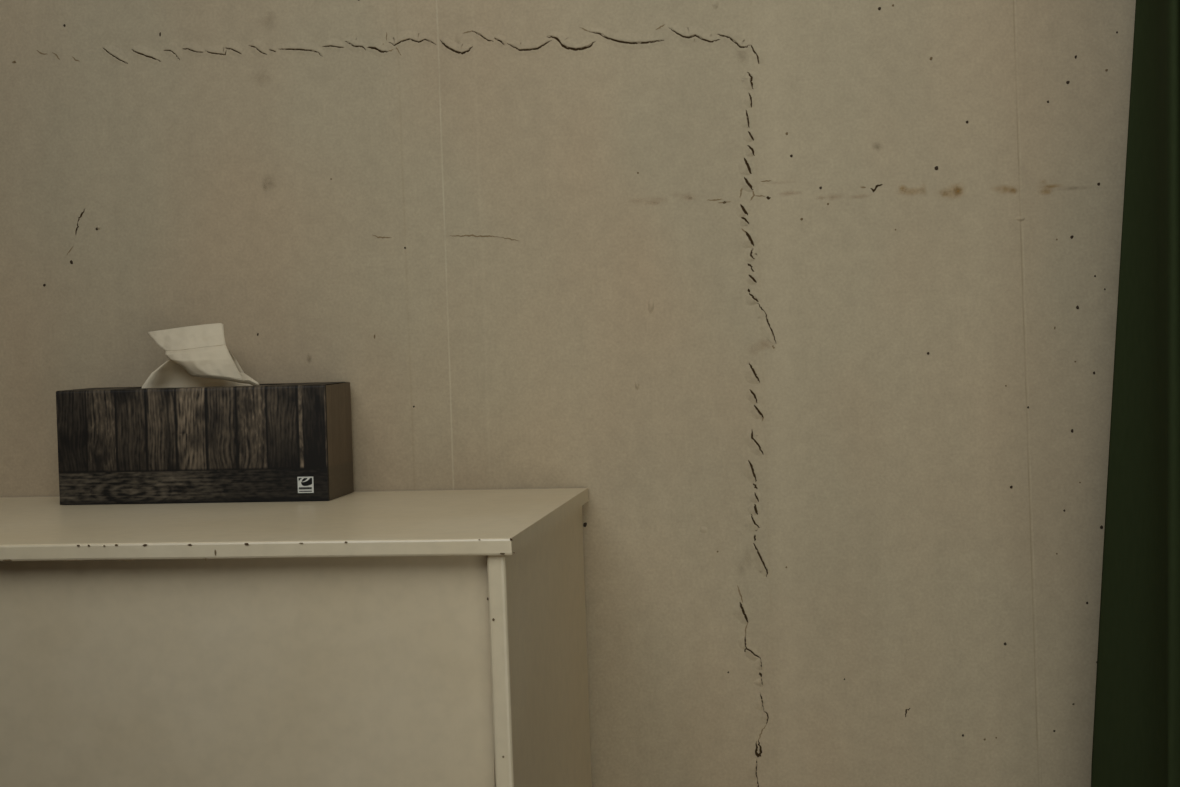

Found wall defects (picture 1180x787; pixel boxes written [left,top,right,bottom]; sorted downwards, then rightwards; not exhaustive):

crack [12,25,779,787]